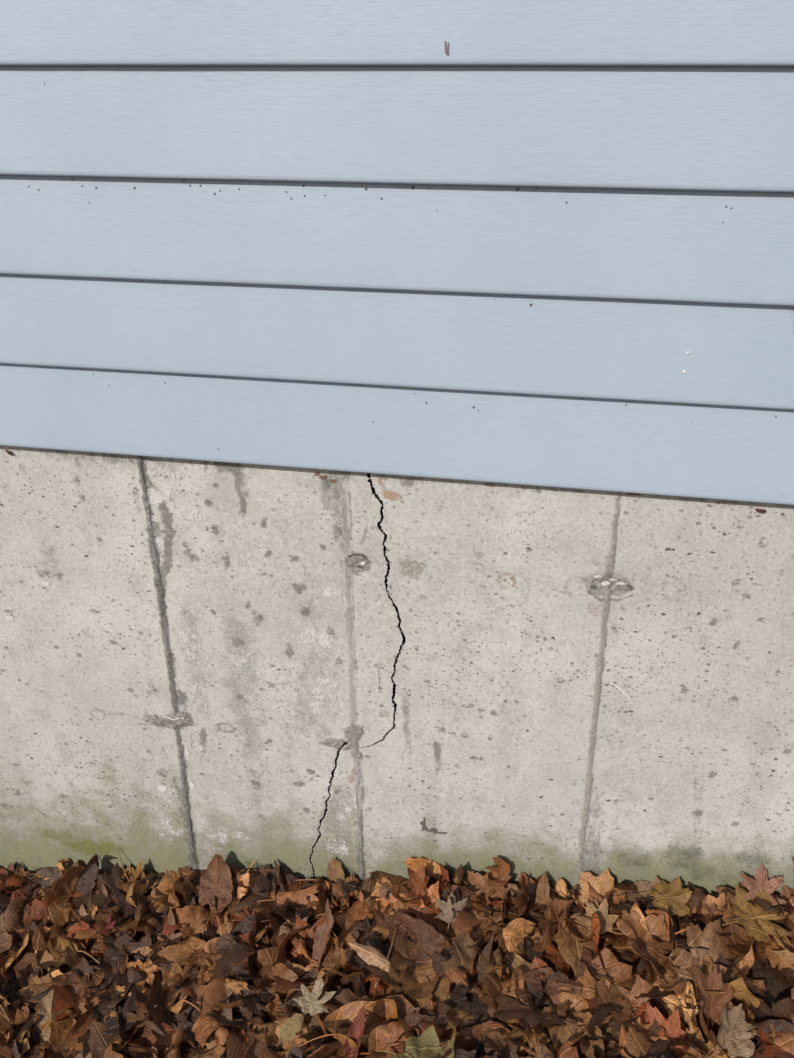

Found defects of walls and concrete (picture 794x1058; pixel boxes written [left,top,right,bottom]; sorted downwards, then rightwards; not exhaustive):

water stain [293,755,353,820]
crack [309,473,406,879]